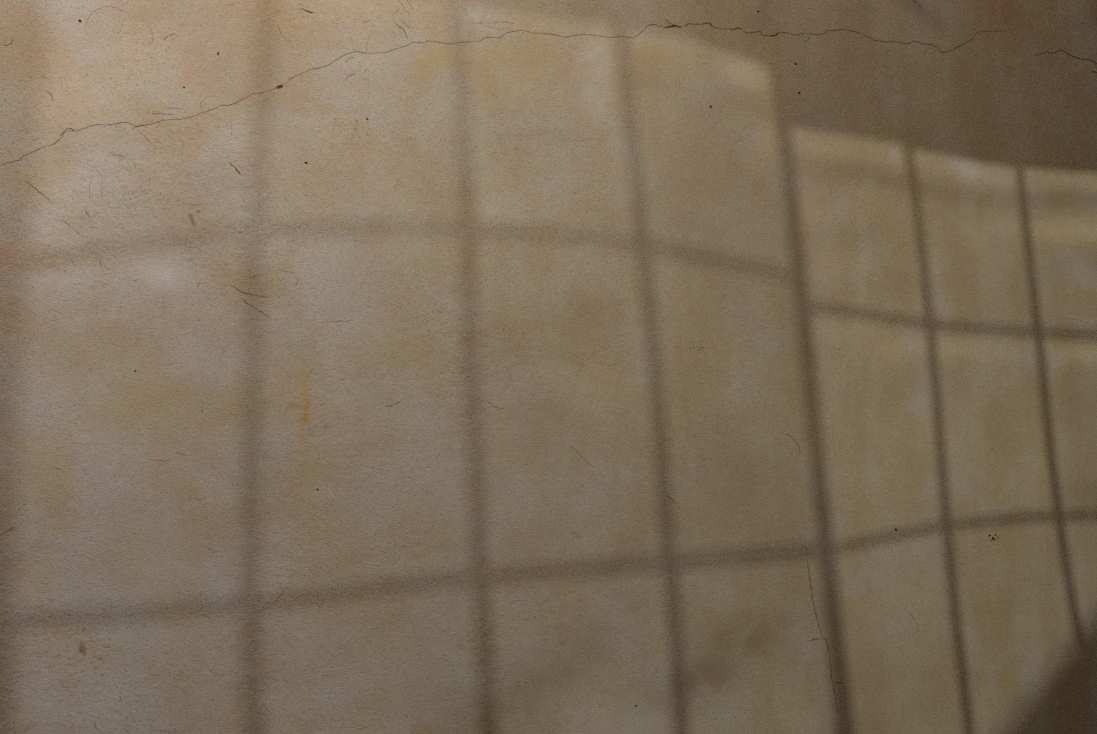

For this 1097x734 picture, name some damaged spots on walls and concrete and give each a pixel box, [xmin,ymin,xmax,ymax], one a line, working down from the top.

crack [5,19,1007,164]